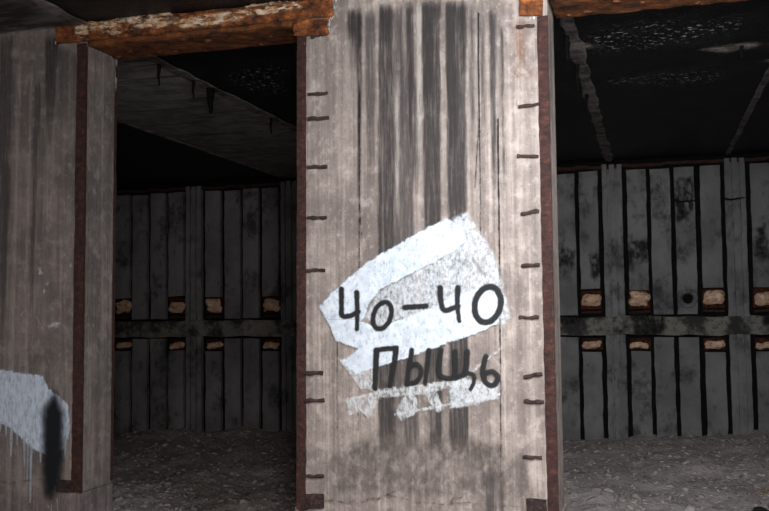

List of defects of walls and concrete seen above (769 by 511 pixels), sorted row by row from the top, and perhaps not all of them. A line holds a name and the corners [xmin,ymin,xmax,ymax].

water stain [348,5,505,255]
water stain [379,273,415,326]
water stain [426,244,468,309]
water stain [379,355,418,439]
water stain [429,337,468,443]
water stain [486,475,503,511]